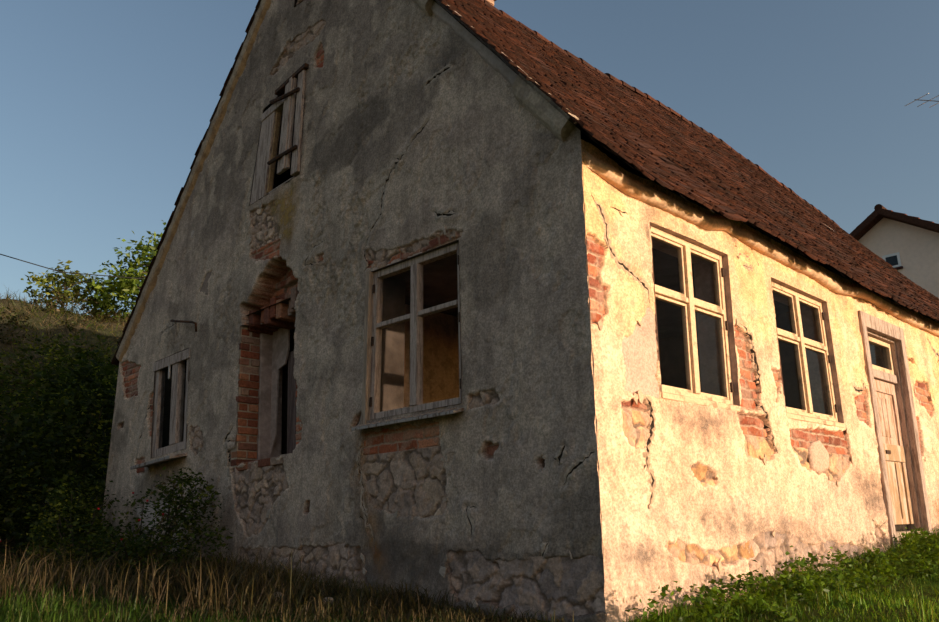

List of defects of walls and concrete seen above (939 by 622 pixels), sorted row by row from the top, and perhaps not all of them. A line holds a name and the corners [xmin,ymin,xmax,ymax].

crack [364,122,428,267]
spalling [586,235,606,331]
crack [591,194,650,303]
spalling [122,361,141,400]
spalling [363,422,448,518]
crack [642,396,656,508]
spalling [734,318,774,465]
spalling [789,427,855,487]
spalling [854,391,866,423]
spalling [913,381,934,462]
spalling [439,550,606,618]
spalling [665,530,867,584]